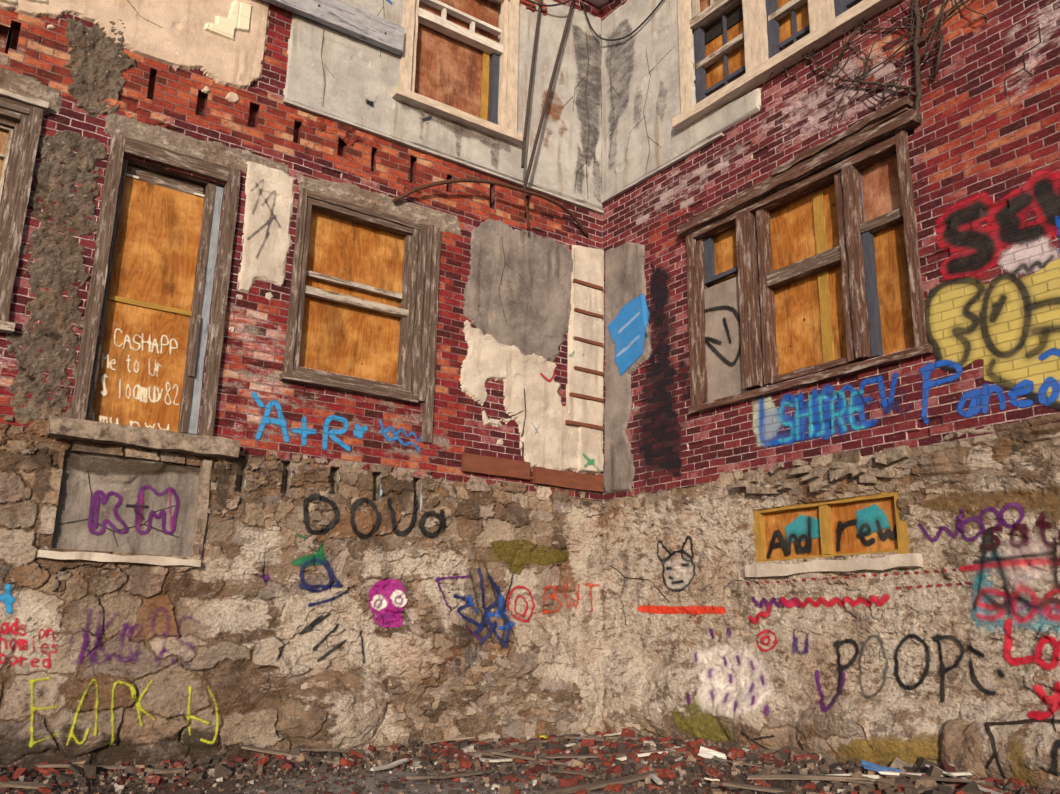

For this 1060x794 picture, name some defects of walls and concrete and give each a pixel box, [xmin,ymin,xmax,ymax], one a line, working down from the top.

flaking render [0,0,270,130]
water stain [573,20,639,191]
spalling [6,121,107,423]
flaking render [459,219,652,494]